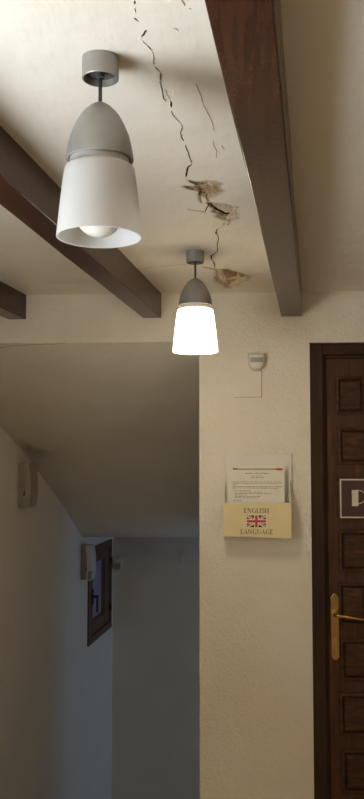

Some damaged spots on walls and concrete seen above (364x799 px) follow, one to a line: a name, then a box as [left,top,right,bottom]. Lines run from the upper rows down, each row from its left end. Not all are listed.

crack [134,0,193,177]
crack [196,85,224,158]
flaking render [183,180,237,225]
crack [209,223,228,269]
flaking render [203,262,247,288]